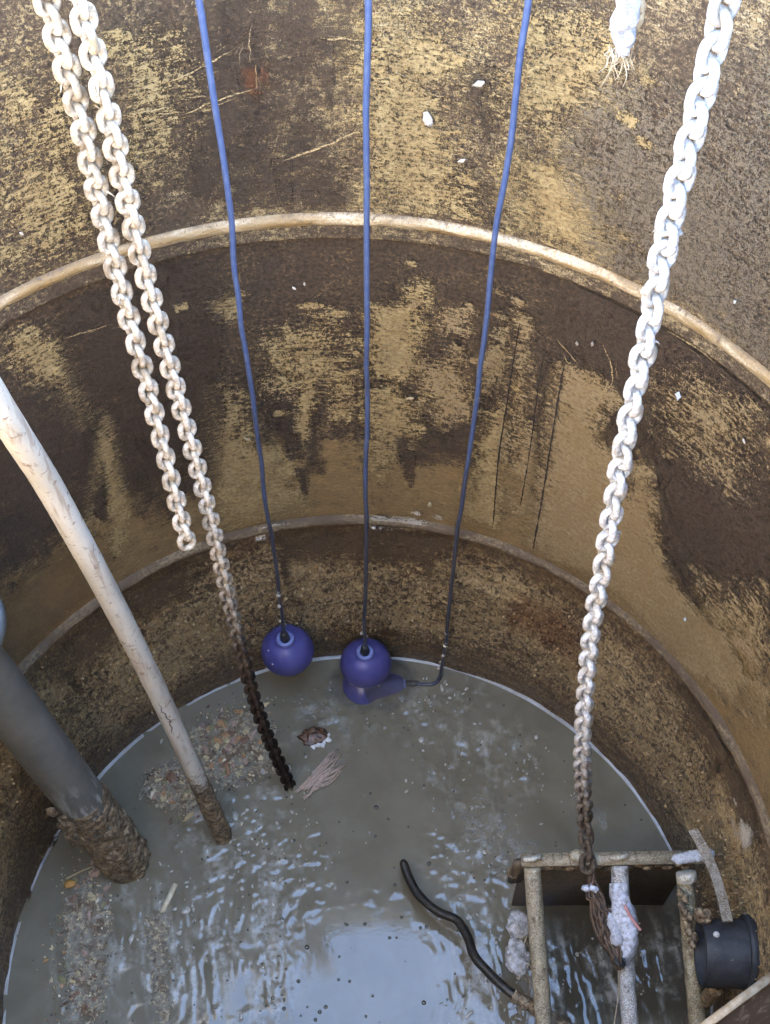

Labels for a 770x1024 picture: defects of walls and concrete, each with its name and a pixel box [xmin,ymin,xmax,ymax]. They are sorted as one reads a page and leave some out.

damp [257,370,327,496]
crack [490,323,564,552]